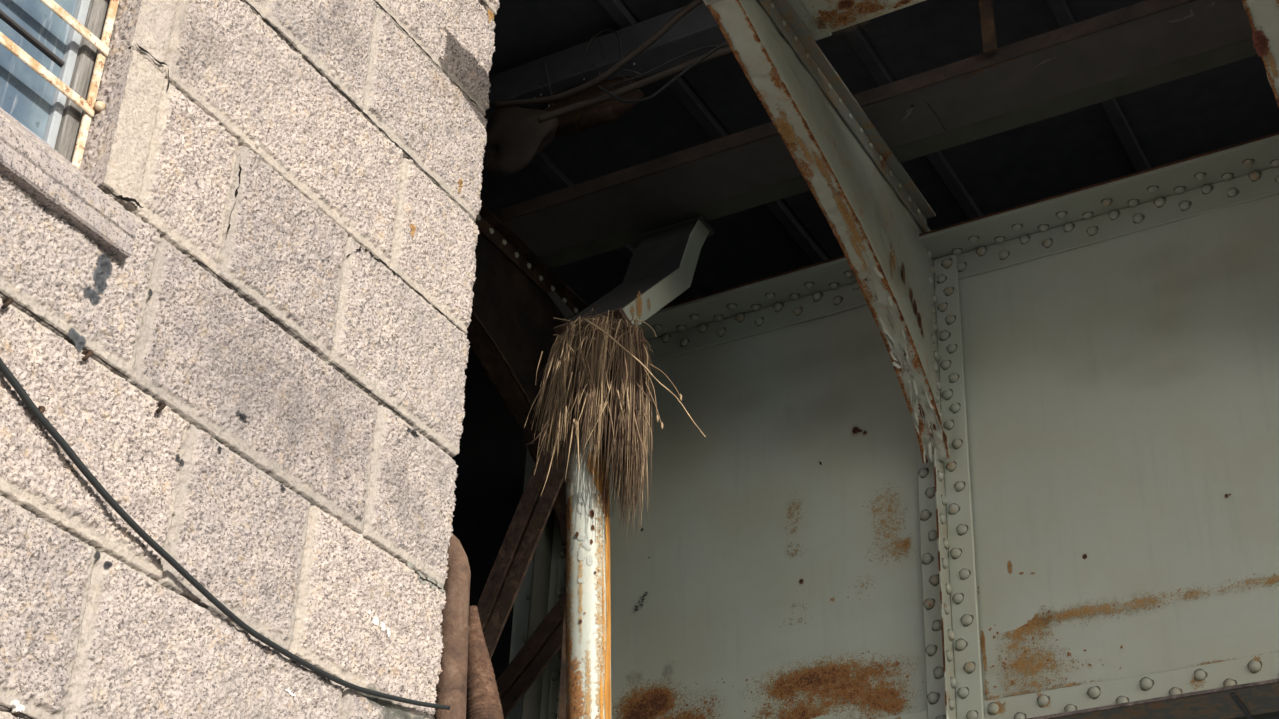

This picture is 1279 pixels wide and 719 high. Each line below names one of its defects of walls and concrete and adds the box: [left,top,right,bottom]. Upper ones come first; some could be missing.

crack [226,159,242,239]
corrosion [707,0,949,492]
peeling [863,250,947,463]
corrosion [565,439,924,719]
corrosion [980,574,1279,714]